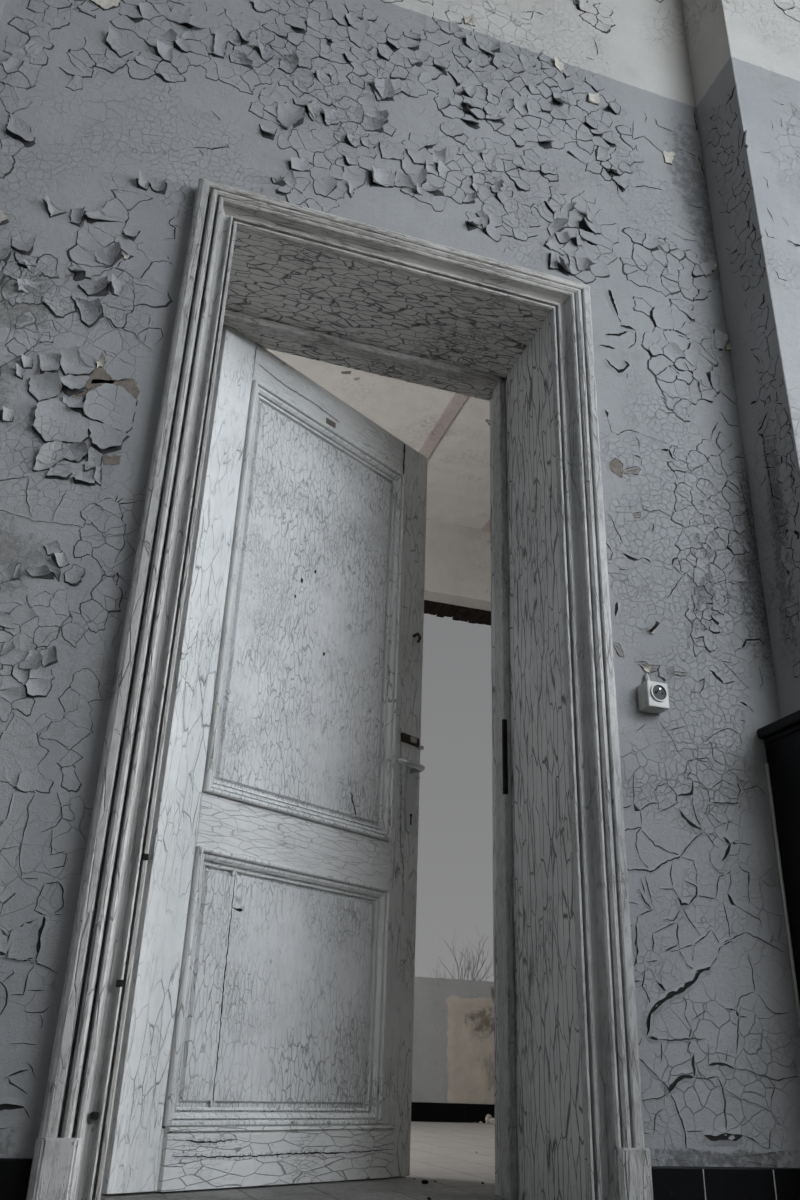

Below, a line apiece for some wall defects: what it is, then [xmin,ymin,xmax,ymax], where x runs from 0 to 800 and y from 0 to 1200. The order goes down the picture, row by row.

peeling [0,0,732,422]
peeling [0,169,173,793]
crack [258,363,340,424]
crack [612,600,620,617]
spalling [607,456,642,480]
crack [598,289,800,612]
peeling [0,918,39,961]
crack [0,788,74,1132]
crack [623,569,800,1151]
crack [171,1137,388,1160]